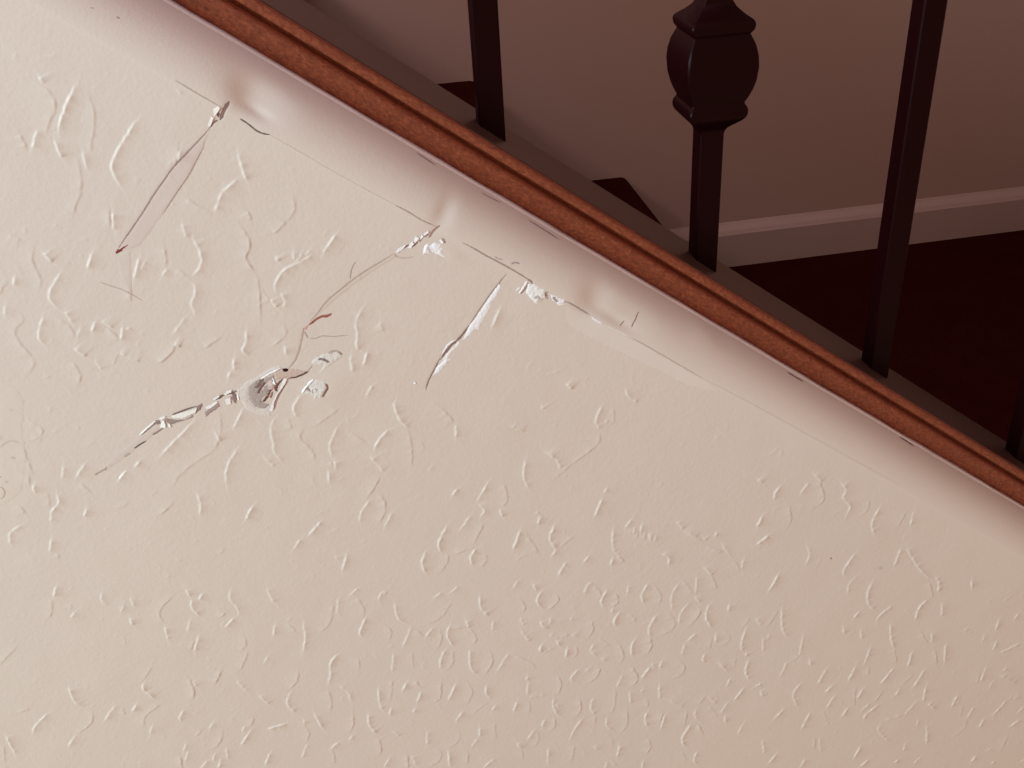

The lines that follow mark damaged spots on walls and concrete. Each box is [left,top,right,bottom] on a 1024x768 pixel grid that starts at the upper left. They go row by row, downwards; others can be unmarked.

flaking render [155,390,239,428]
crack [117,80,590,457]